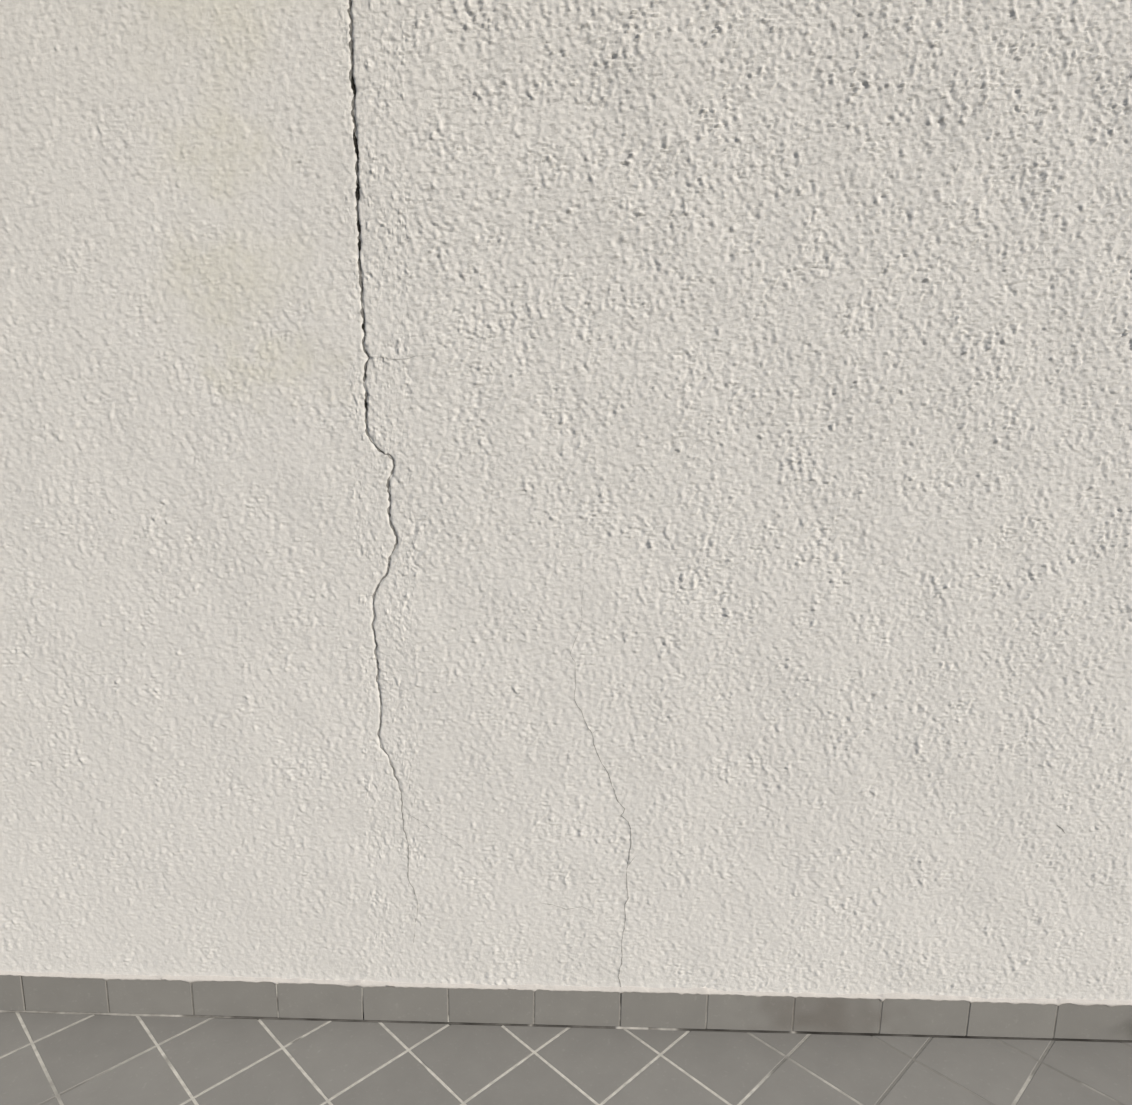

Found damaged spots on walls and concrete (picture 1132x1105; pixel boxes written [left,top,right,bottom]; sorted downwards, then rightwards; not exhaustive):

crack [347,0,471,943]
crack [570,592,636,987]